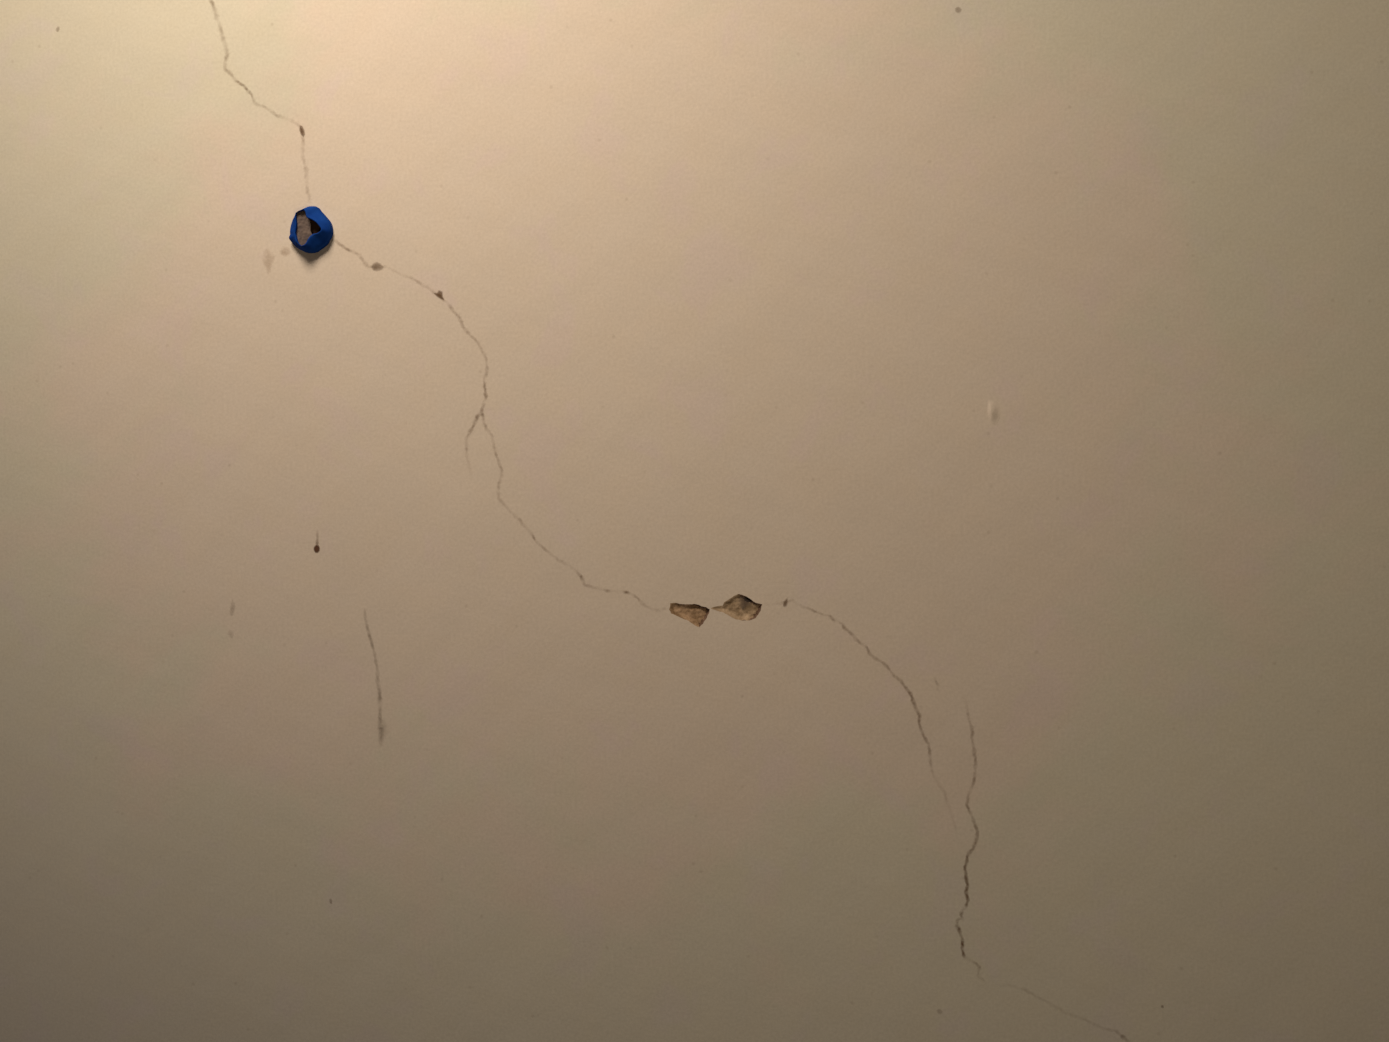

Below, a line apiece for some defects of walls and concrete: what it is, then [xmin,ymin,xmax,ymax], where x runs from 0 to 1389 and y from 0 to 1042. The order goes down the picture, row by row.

flaking render [669,594,762,627]